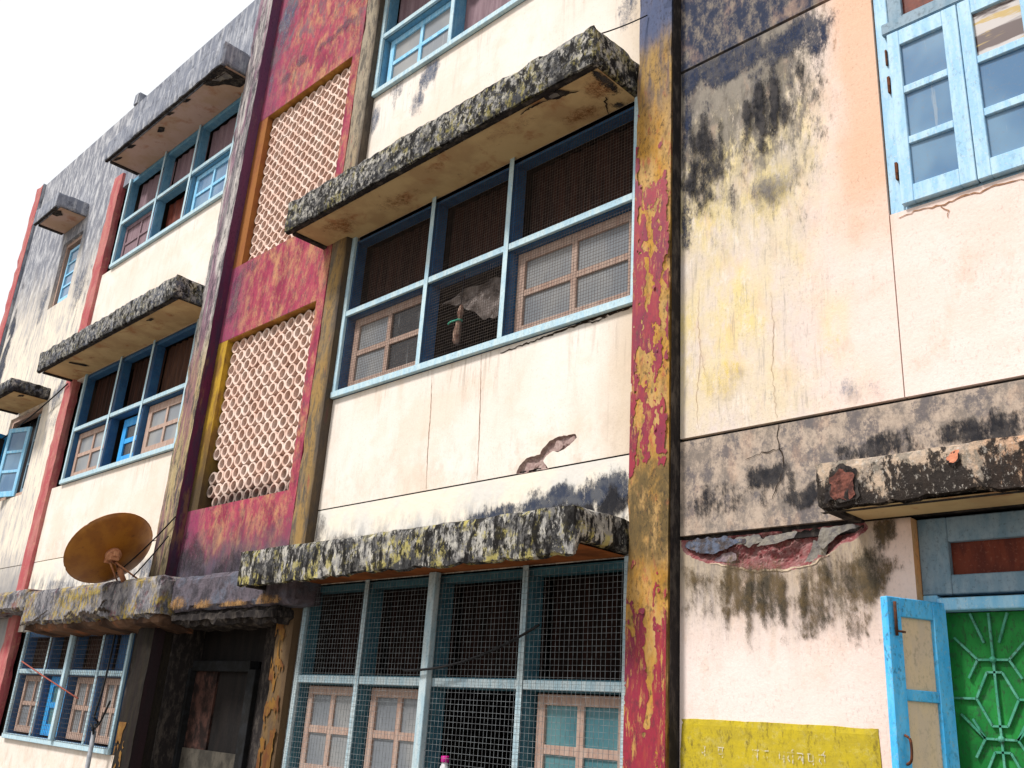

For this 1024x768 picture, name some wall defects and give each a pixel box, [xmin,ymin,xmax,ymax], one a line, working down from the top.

damp [680,12,835,248]
crack [899,179,1024,218]
peeling [629,146,669,478]
spalling [516,434,577,474]
damp [694,462,818,515]
crack [745,302,784,499]
spalling [681,522,868,573]
damp [685,519,897,645]
damp [836,428,923,460]
damp [935,406,1024,443]
spalling [171,605,294,768]
peeling [622,572,666,768]